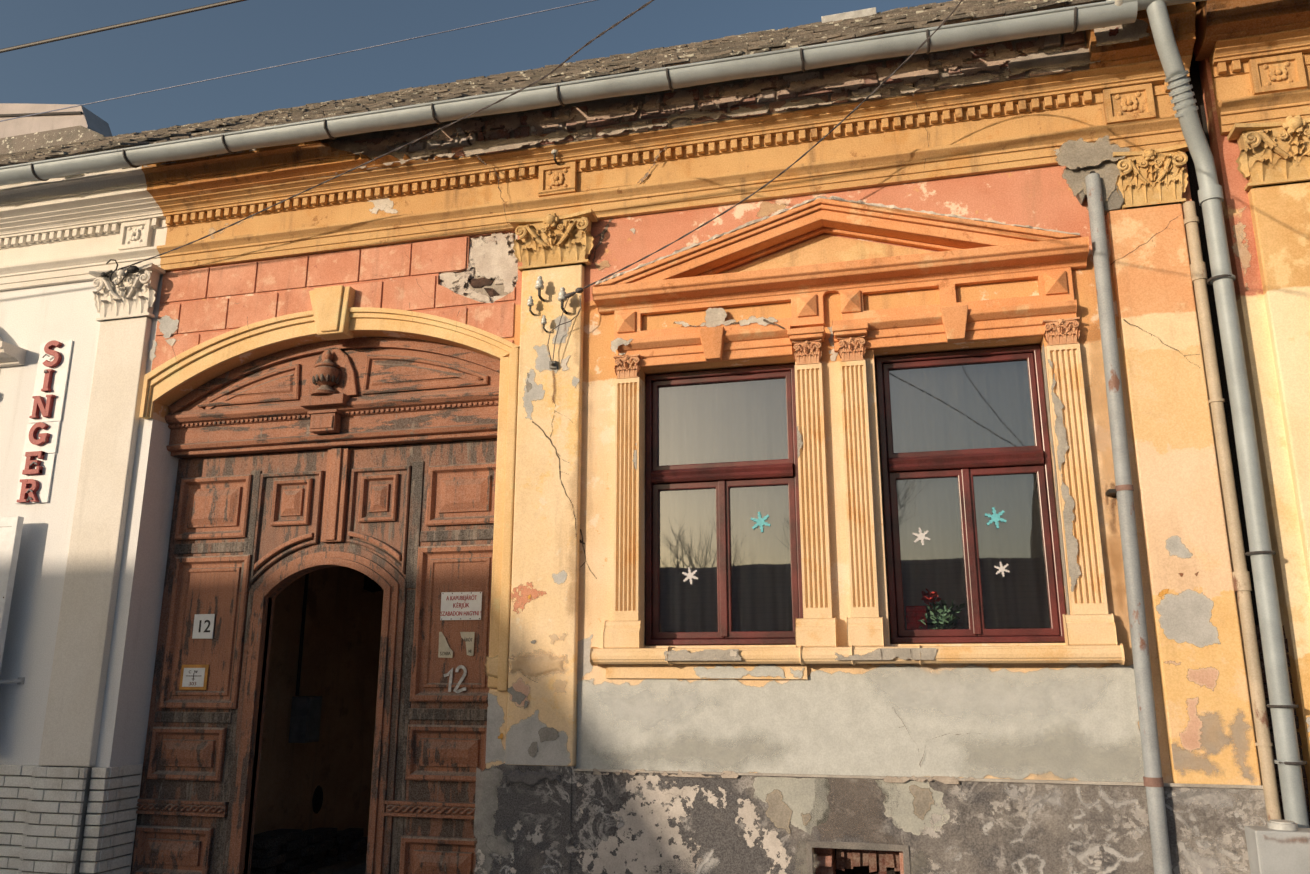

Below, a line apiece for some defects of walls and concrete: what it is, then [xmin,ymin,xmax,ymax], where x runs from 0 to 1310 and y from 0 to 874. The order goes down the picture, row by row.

spalling [318,18,1151,178]
peeling [1054,135,1130,210]
flaking render [148,315,179,361]
spalling [439,233,518,303]
flaking render [522,315,579,420]
flaking render [674,308,778,327]
crack [532,399,597,579]
flaking render [1156,536,1220,648]
flaking render [485,634,1144,836]
flaking render [1165,660,1253,782]